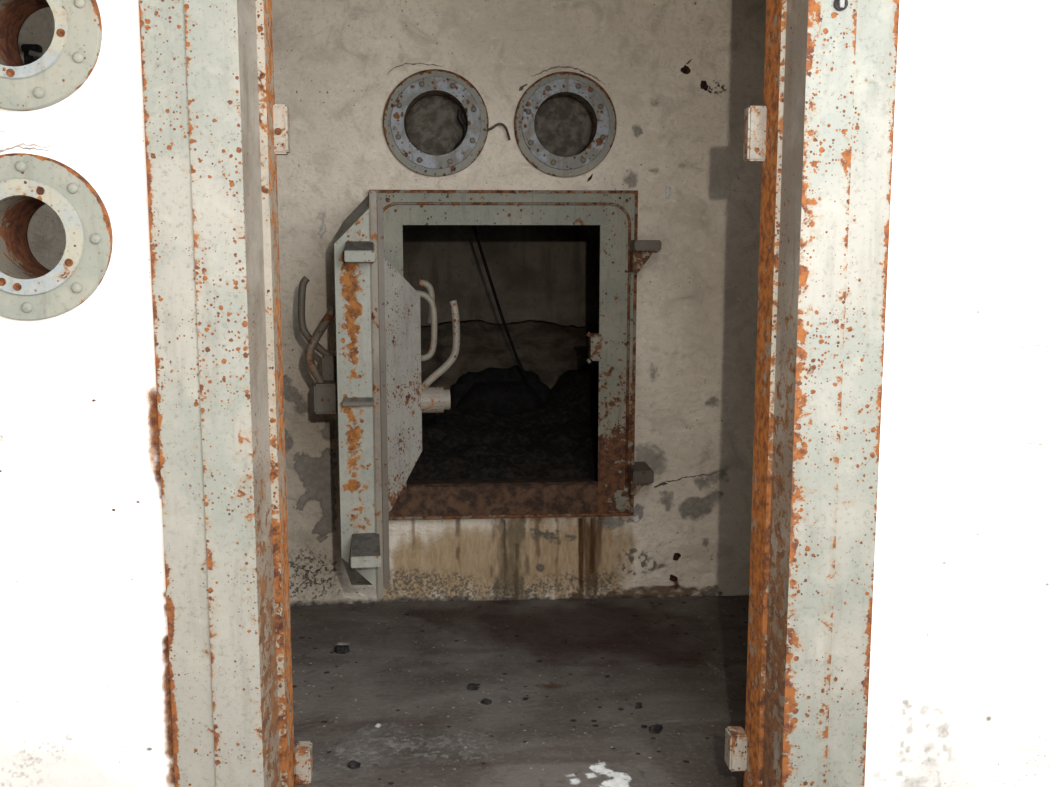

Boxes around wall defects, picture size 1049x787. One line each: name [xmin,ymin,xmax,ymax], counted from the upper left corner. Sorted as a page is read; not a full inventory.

rust [148,391,162,498]
crack [654,469,727,488]
damp [383,517,631,602]
rust [162,635,175,785]